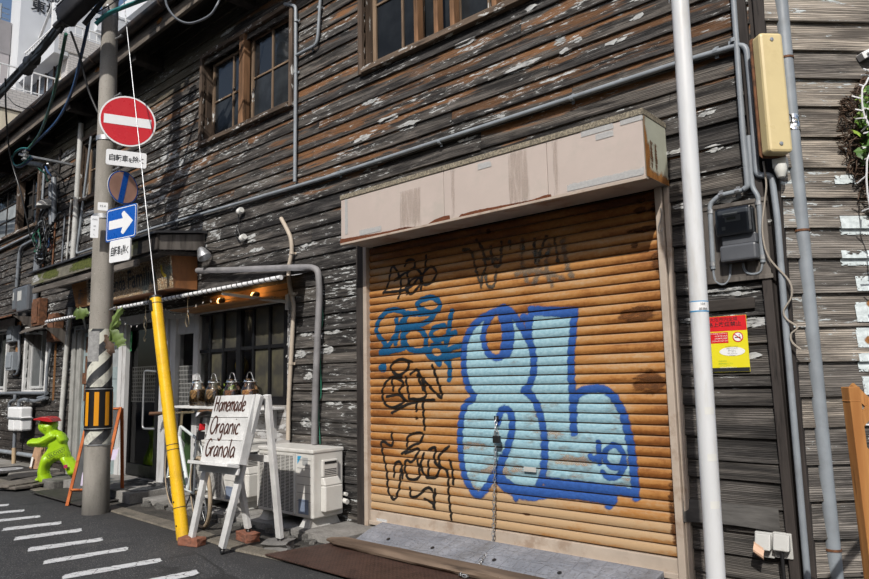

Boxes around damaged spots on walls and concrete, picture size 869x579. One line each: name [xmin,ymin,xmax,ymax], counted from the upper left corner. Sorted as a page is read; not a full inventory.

peeling [554,35,582,55]
peeling [505,57,541,75]
peeling [378,113,420,131]
peeling [834,175,856,184]
peeling [64,208,94,256]
peeling [840,216,869,235]
peeling [840,250,869,291]
corrosion [618,306,654,322]
peeling [855,302,869,397]
corrosion [633,369,666,394]
peeling [320,387,342,406]